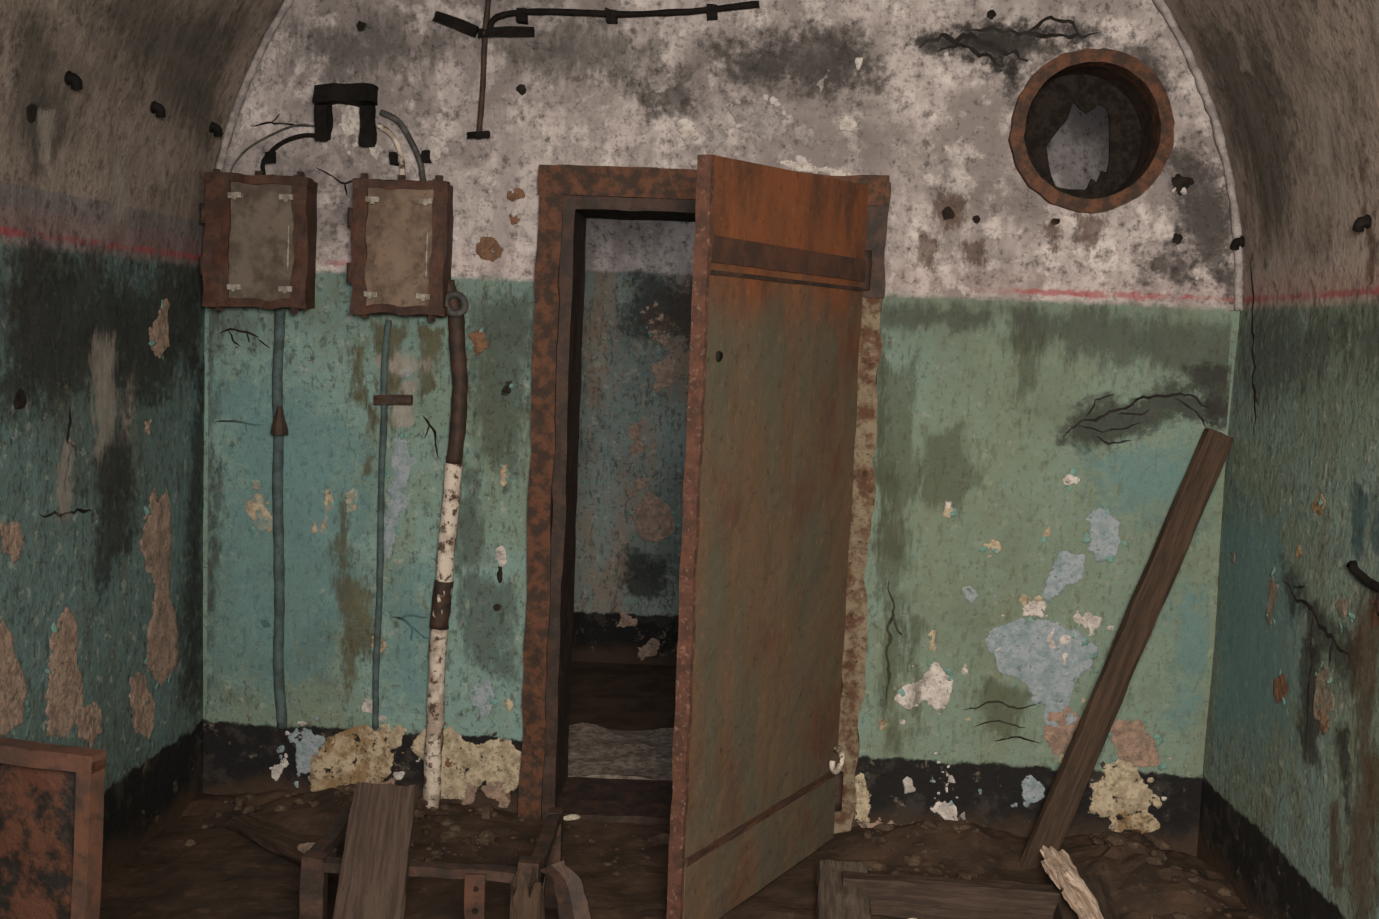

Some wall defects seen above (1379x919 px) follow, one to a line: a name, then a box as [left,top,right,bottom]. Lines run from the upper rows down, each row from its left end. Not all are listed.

leakage [641,67,689,118]
leakage [711,26,885,96]
crack [919,15,1094,67]
crack [1063,393,1207,445]
leakage [0,240,205,706]
peeling [878,630,968,731]
peeling [985,506,1128,764]
spalling [269,698,426,793]
spalling [440,678,522,808]
spalling [903,752,966,821]
spalling [1011,775,1045,808]
spalling [1088,718,1172,834]